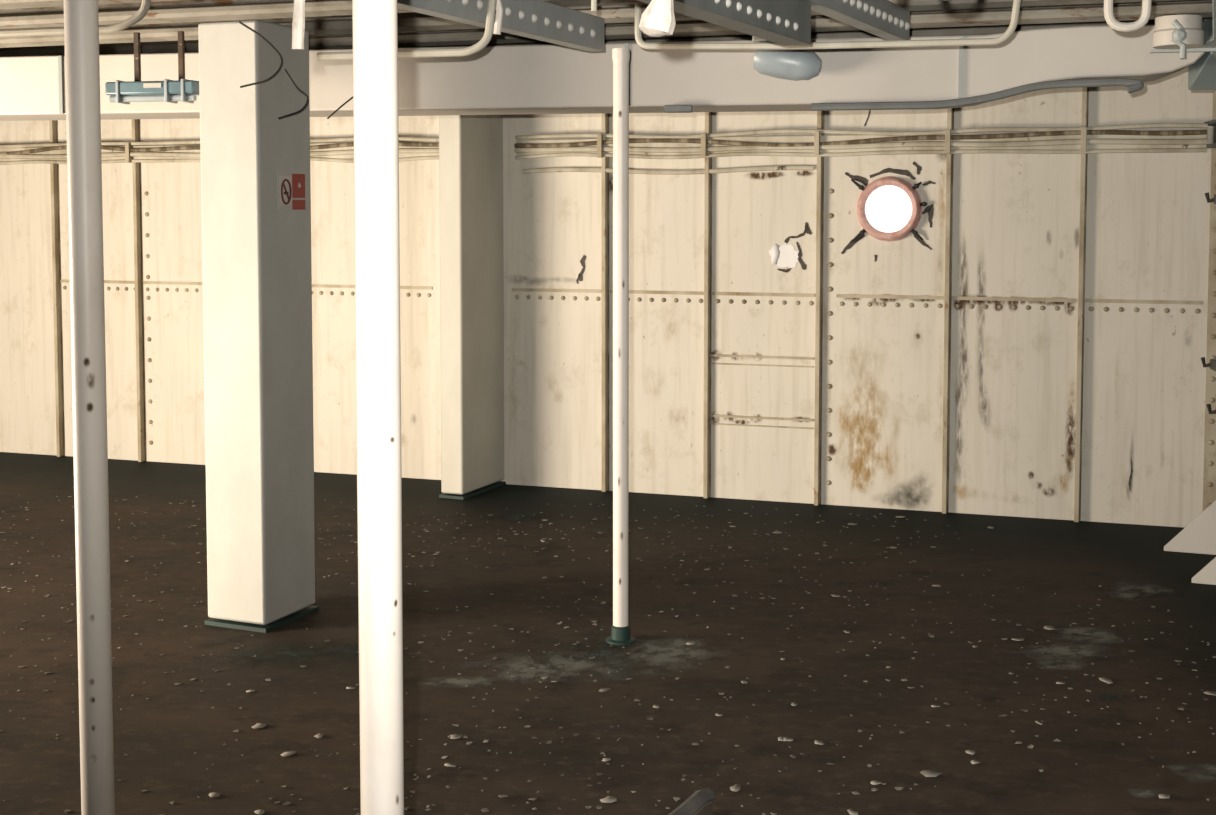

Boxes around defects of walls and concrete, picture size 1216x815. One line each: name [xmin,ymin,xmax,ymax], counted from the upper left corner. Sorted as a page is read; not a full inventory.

peeling [769,222,812,273]